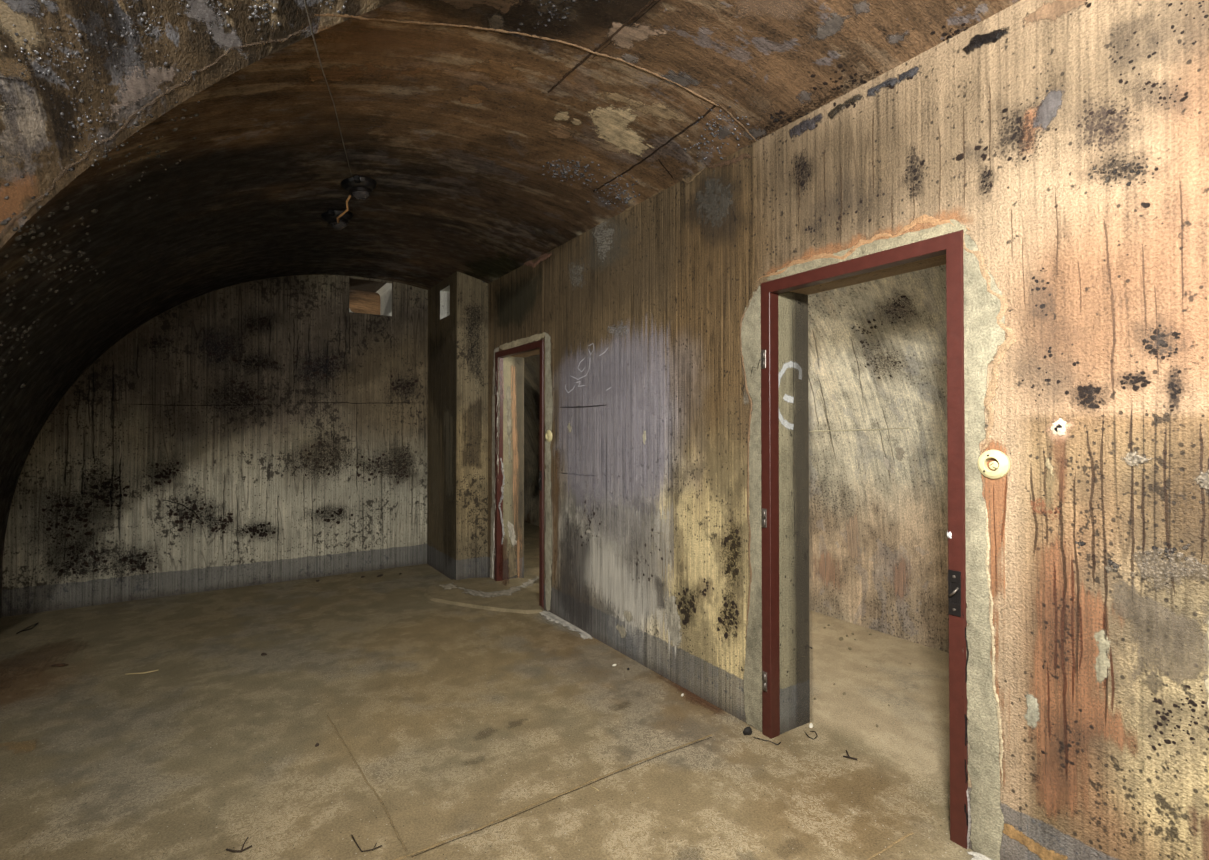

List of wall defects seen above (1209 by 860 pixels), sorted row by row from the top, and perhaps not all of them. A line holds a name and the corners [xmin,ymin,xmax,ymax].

leakage [0,0,463,239]
peeling [549,92,686,155]
leakage [956,85,1063,194]
mould [1073,101,1158,187]
mould [1112,31,1188,106]
mould [1158,1,1209,45]
leakage [463,304,483,467]
leakage [31,363,158,580]
leakage [167,473,279,562]
flaking render [739,213,1016,860]
rust [979,441,1007,662]
rust [1035,539,1137,816]